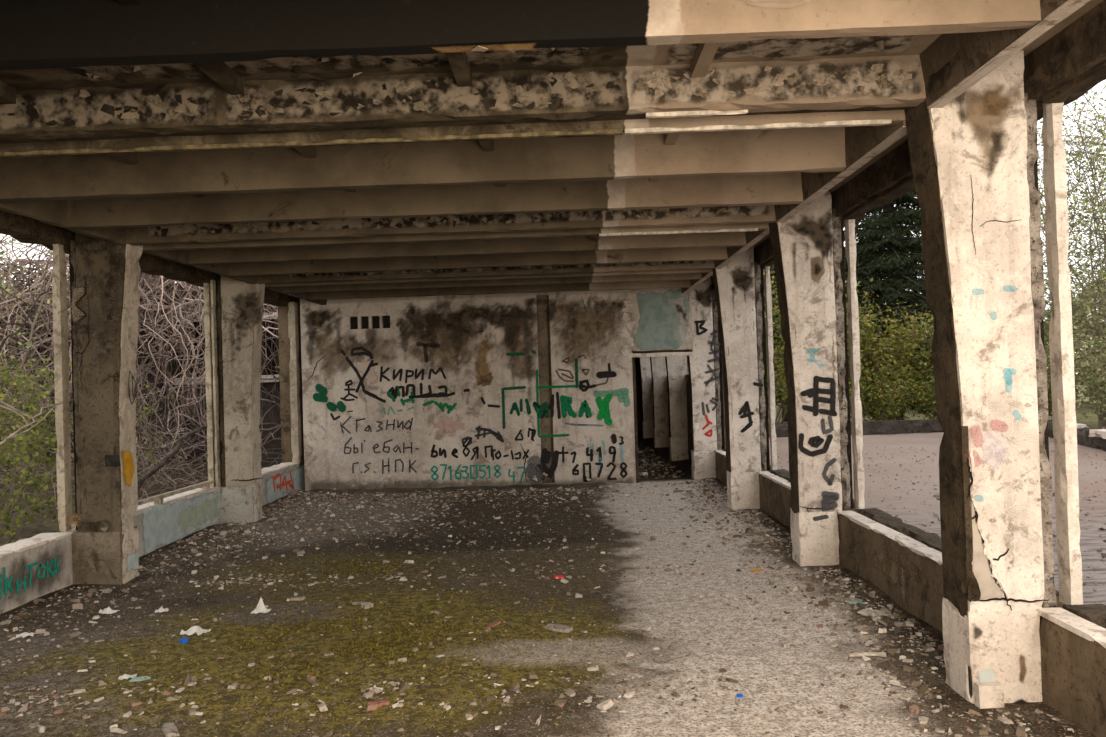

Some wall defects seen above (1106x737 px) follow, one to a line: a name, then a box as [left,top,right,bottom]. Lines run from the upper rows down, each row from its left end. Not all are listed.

leakage [955,87,1019,170]
leakage [791,209,836,272]
leakage [307,309,389,375]
leakage [397,298,622,379]
crack [966,453,1049,611]